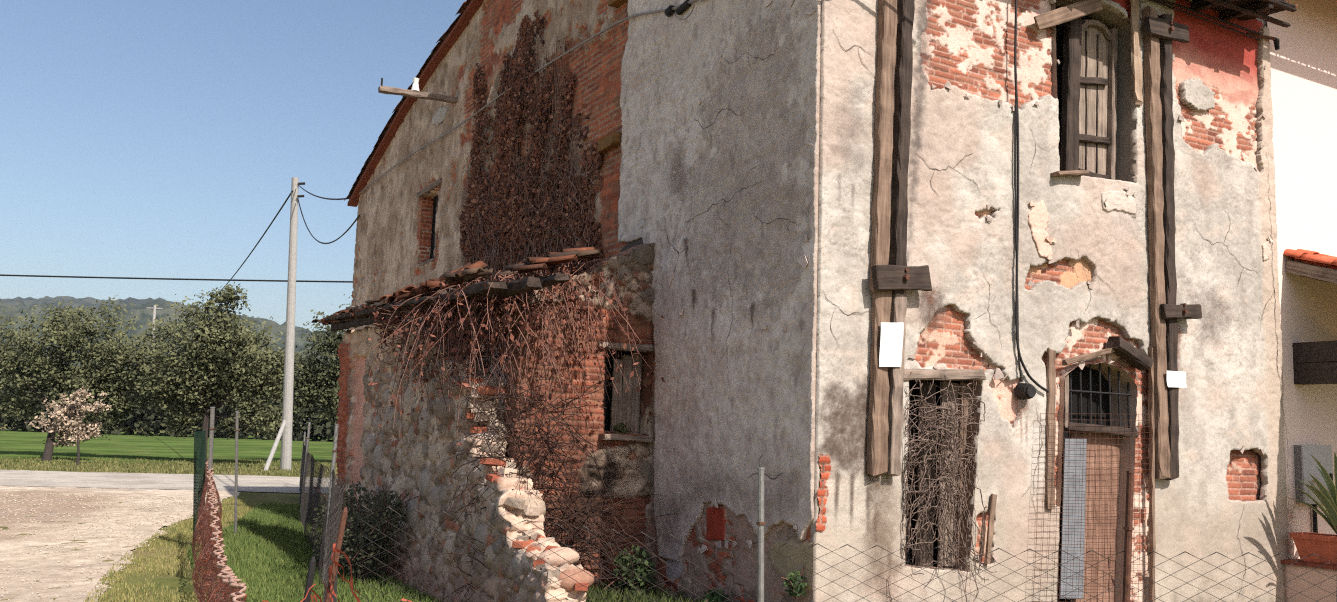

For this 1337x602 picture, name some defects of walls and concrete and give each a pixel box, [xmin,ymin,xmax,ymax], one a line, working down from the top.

flaking render [919,0,1060,111]
flaking render [1105,0,1146,22]
flaking render [1172,0,1267,171]
flaking render [1024,200,1094,290]
flaking render [909,305,1020,426]
flaking render [662,454,831,602]
flaking render [1042,318,1157,602]
flaking render [1226,445,1268,501]